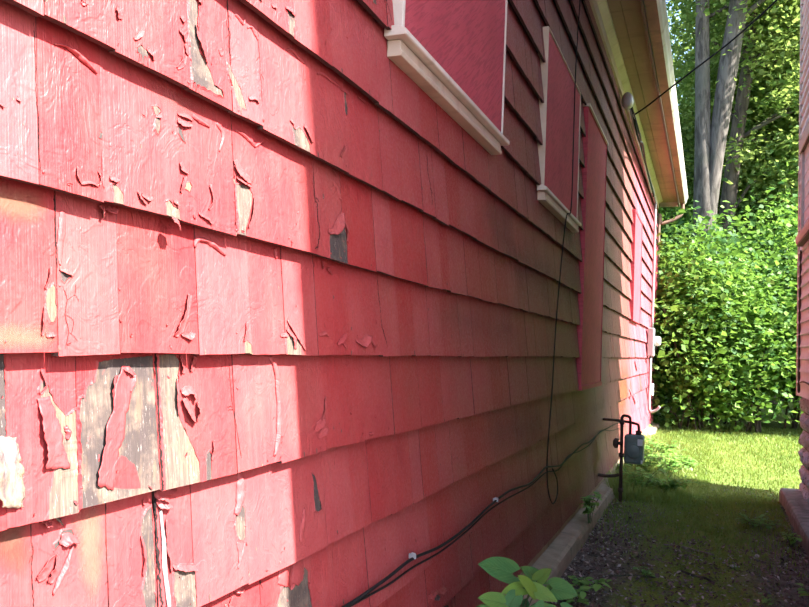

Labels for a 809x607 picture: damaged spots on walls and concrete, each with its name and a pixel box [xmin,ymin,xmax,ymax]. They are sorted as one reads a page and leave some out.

peeling [177,0,261,115]
peeling [77,131,124,205]
peeling [164,161,193,231]
peeling [177,112,264,151]
peeling [234,159,255,236]
peeling [290,119,313,153]
peeling [42,209,74,338]
peeling [328,212,350,264]
crack [63,287,79,344]
peeling [0,353,26,509]
peeling [37,354,216,607]
peeling [275,556,313,607]